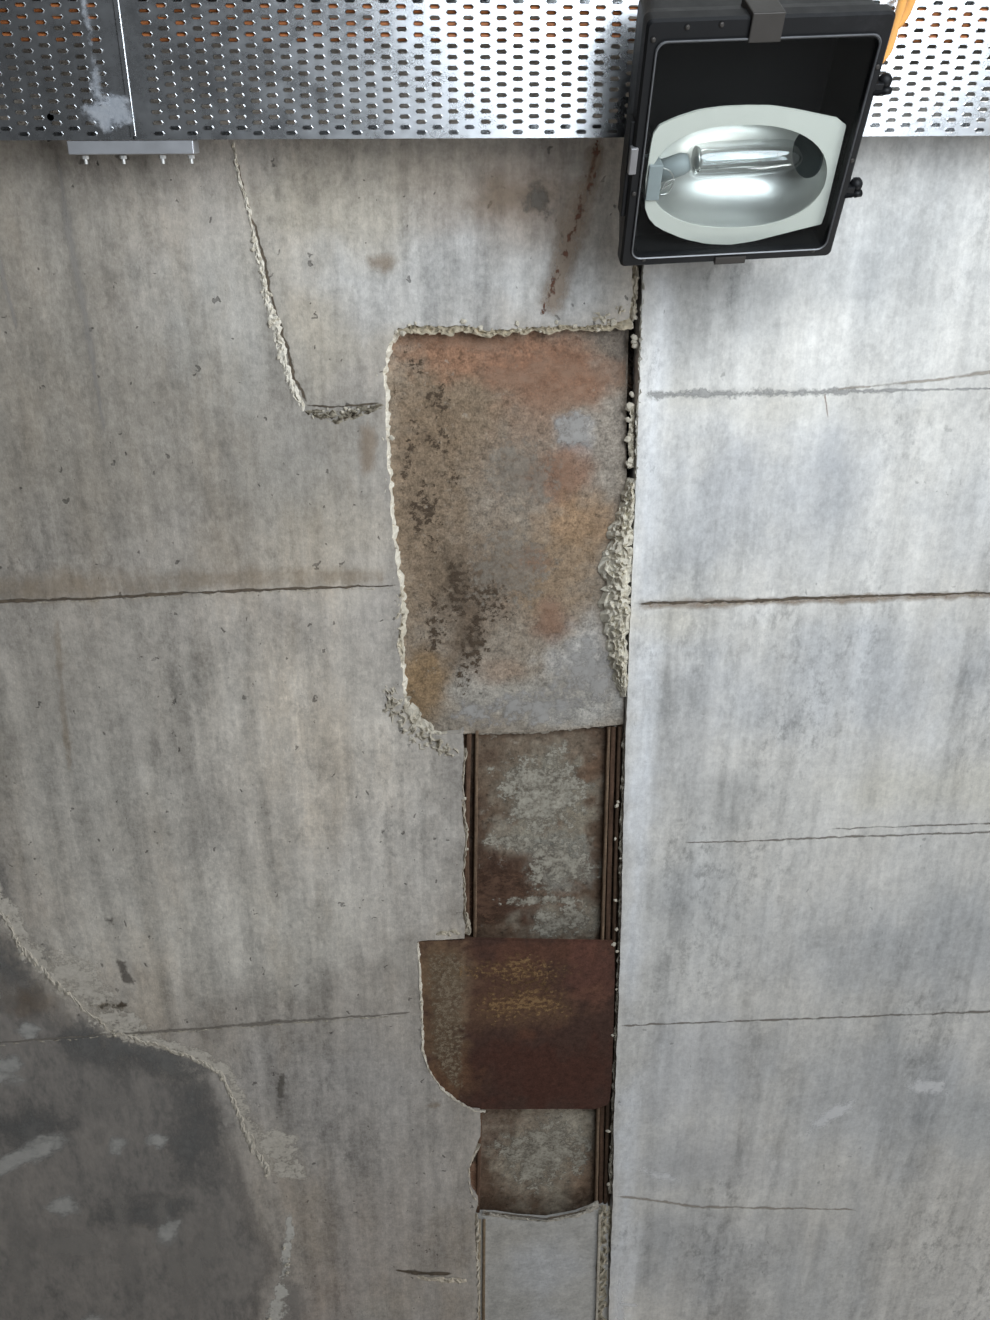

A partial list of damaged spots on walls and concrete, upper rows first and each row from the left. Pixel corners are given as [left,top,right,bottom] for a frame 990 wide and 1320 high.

crack [231,141,386,424]
spalling [207,265,645,1194]
damp [0,949,295,1320]
peeling [0,885,404,1180]
spalling [396,1143,481,1320]
rust [469,869,526,924]
crack [621,1196,851,1210]